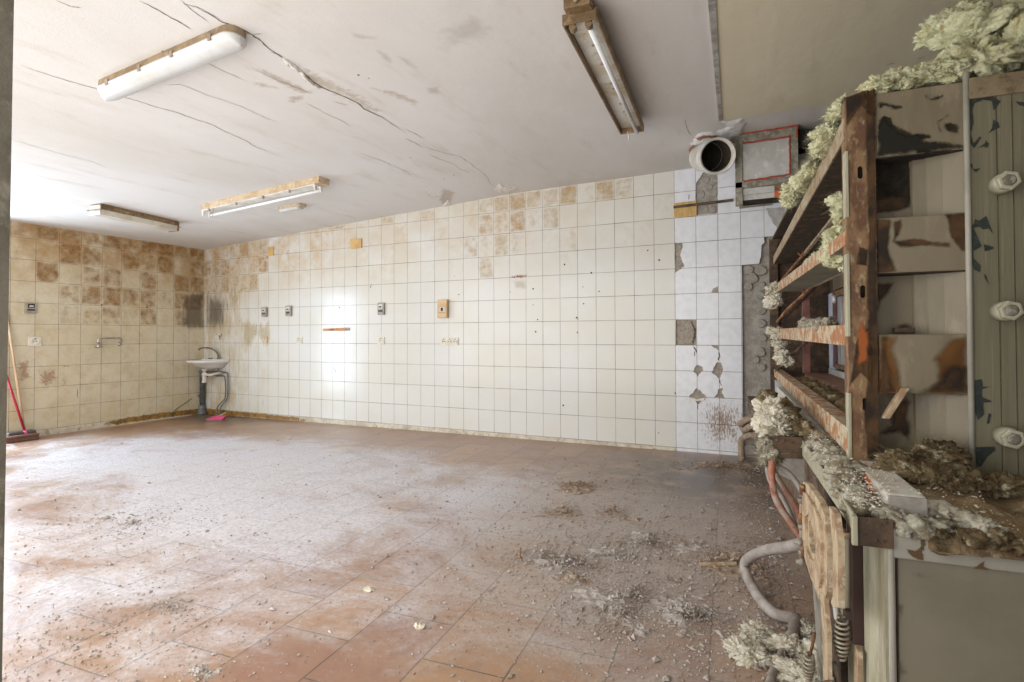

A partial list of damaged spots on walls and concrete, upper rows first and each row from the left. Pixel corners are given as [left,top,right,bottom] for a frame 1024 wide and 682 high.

crack [142,2,490,183]
spalling [675,243,684,273]
leakage [83,278,155,319]
spalling [676,320,696,345]
spalling [690,345,725,404]
rust [706,406,736,440]